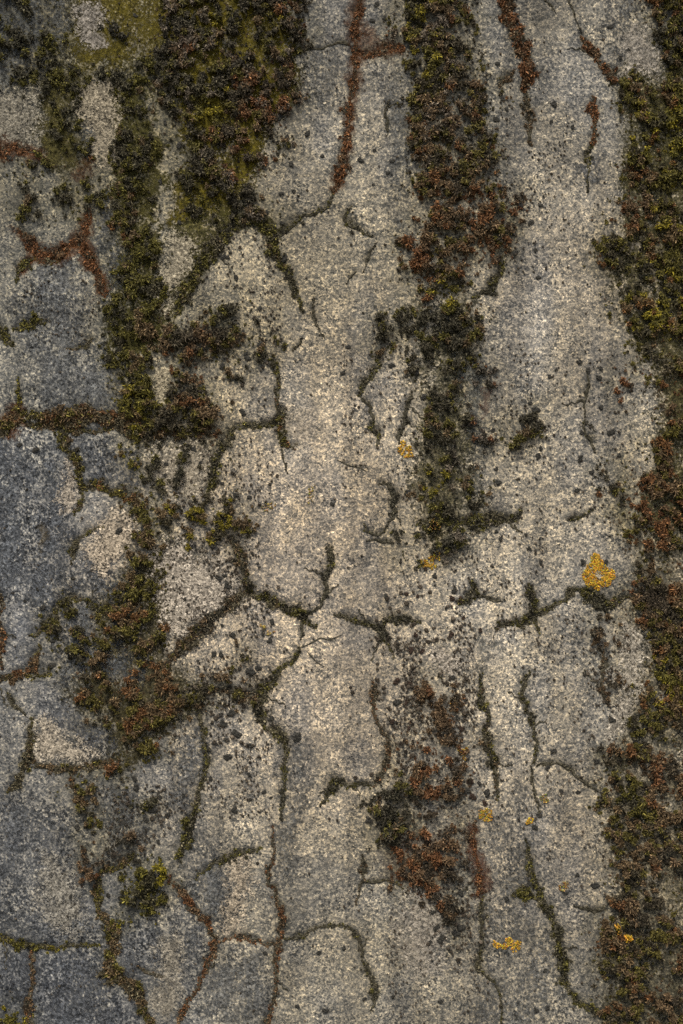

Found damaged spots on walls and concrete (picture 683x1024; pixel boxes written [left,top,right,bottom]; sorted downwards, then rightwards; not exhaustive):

leakage [0,0,81,113]
crack [497,0,541,147]
crack [544,0,618,193]
leakage [2,191,128,413]
crack [0,0,405,565]
crack [357,349,425,447]
leakage [452,349,494,499]
crack [339,460,523,546]
crack [456,578,642,634]
crack [0,535,422,1024]
crack [476,670,603,813]
crack [462,820,607,1024]